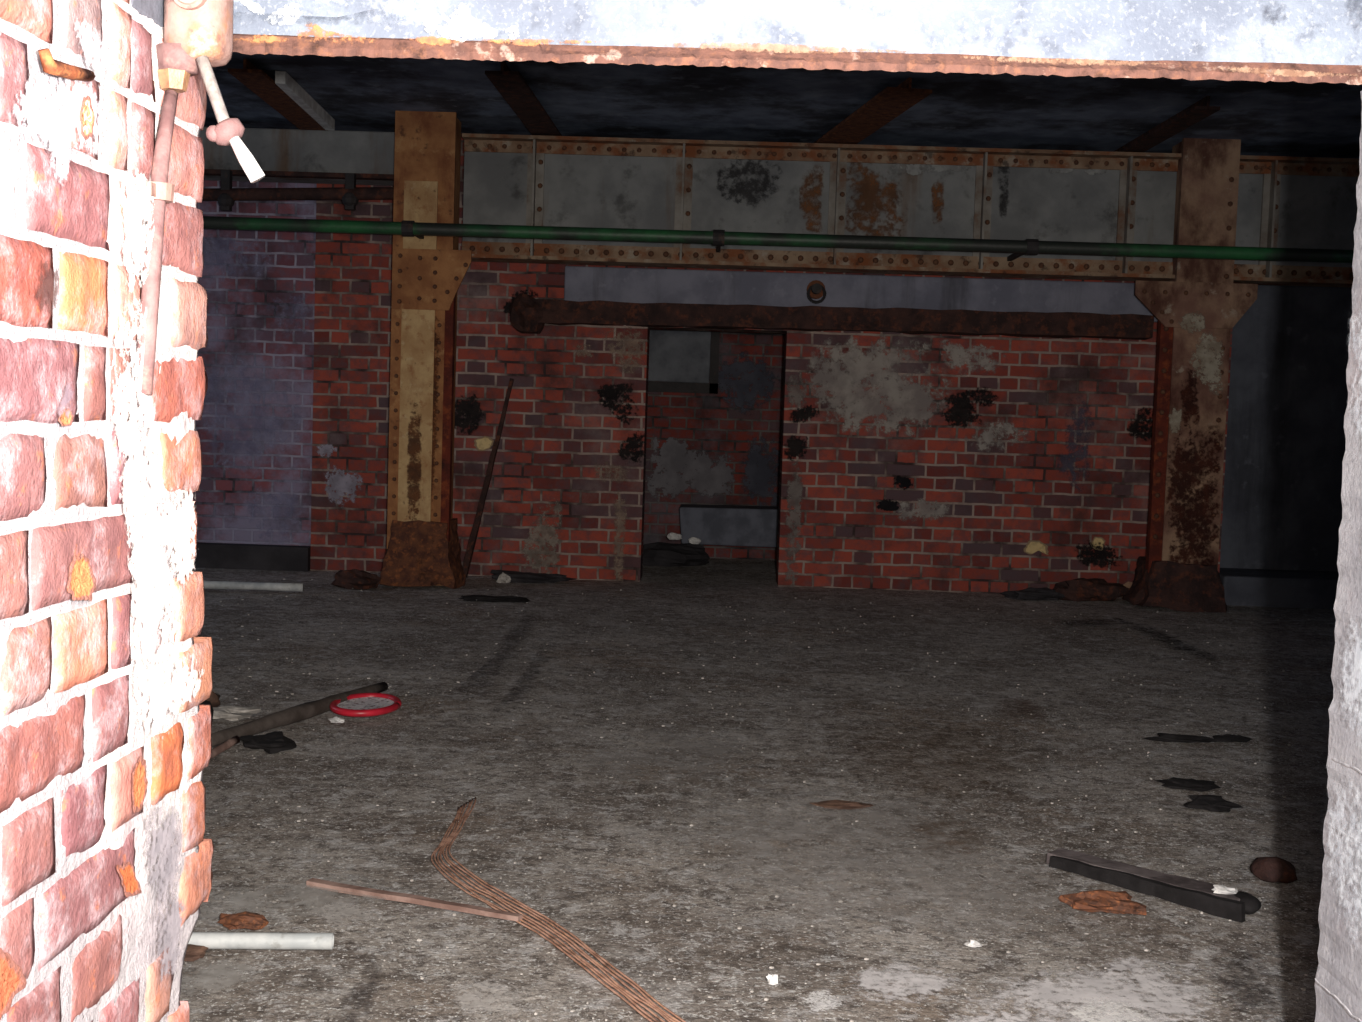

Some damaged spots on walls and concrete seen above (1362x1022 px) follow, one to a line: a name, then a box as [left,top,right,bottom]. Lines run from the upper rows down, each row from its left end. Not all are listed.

peeling [240,0,300,25]
corrosion [242,23,373,44]
corrosion [666,42,906,53]
corrosion [966,56,1165,66]
corrosion [1221,67,1348,77]
leakage [717,159,778,204]
leakage [999,167,1009,216]
leakage [787,335,998,436]
corrosion [407,320,439,528]
leakage [965,422,1027,452]
corrosion [1167,370,1222,566]
leakage [898,499,949,520]